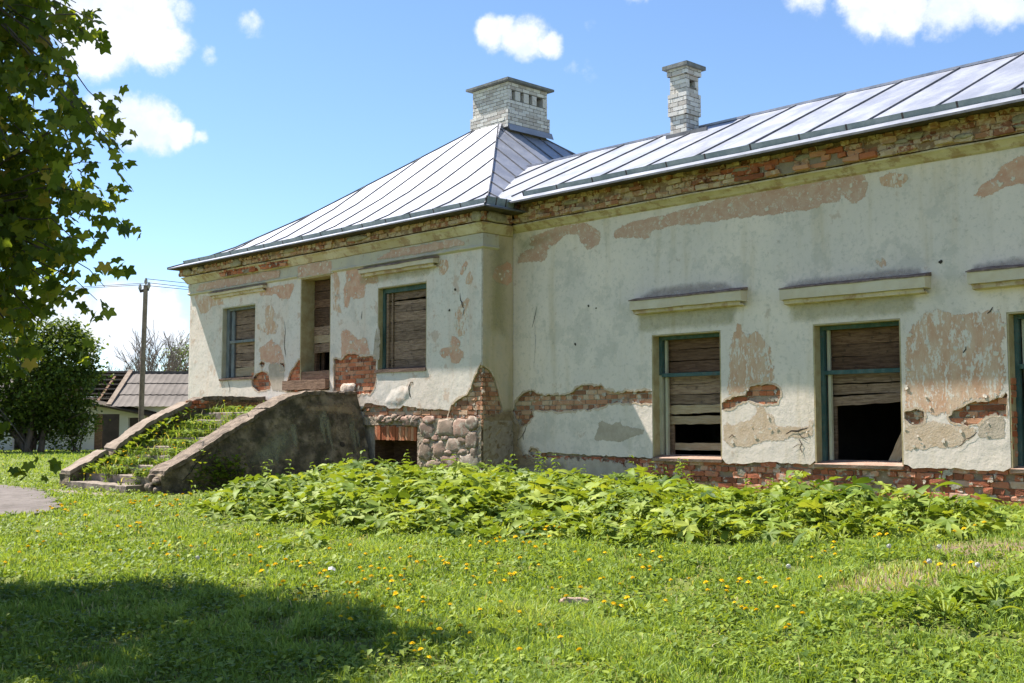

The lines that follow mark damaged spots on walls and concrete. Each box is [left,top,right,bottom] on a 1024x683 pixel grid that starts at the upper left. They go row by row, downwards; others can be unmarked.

peeling [194,261,378,393]
peeling [377,239,473,364]
spalling [332,327,652,442]
peeling [493,222,601,286]
peeling [614,172,908,240]
peeling [723,323,814,448]
crack [786,427,808,452]
peeling [903,309,1018,457]
peeling [974,155,1024,198]